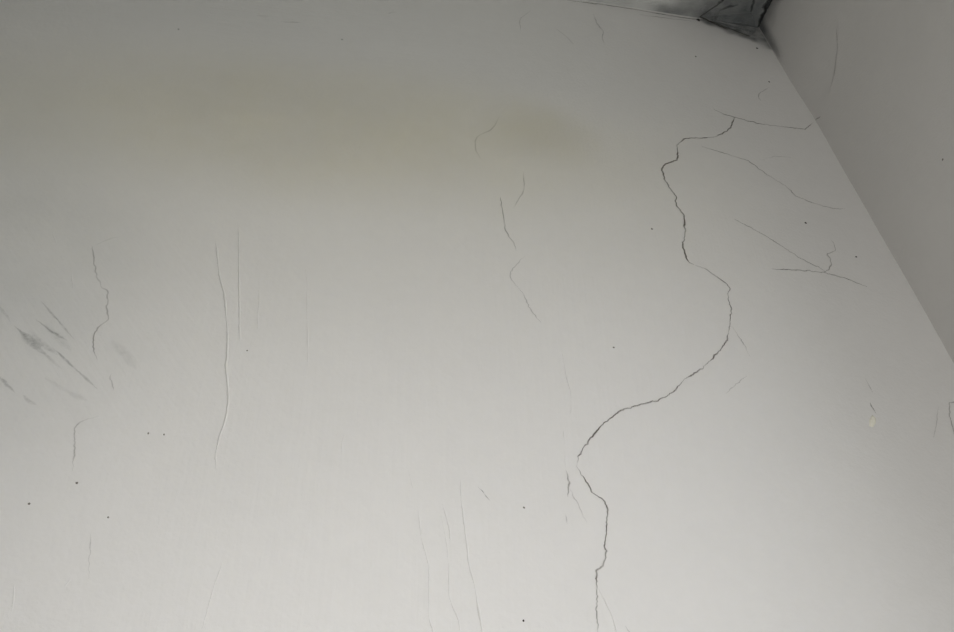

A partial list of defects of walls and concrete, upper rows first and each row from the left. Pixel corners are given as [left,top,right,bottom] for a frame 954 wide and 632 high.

crack [569,113,764,611]